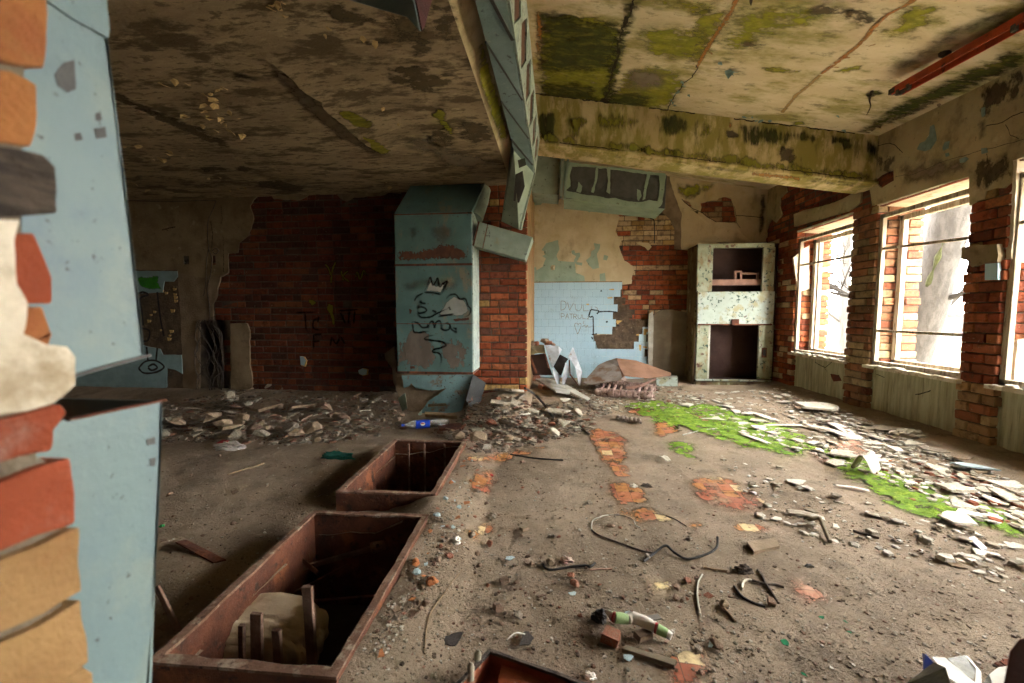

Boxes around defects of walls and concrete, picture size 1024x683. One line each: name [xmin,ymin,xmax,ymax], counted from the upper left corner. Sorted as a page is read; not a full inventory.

leakage [807,5,880,23]
leakage [328,5,457,92]
crack [535,0,638,104]
crack [649,65,698,114]
leakage [662,114,687,135]
leakage [726,126,815,163]
crack [734,118,855,134]
leakage [832,136,852,150]
leakage [860,49,1024,175]
spalling [534,161,736,359]
flaking render [178,187,470,393]